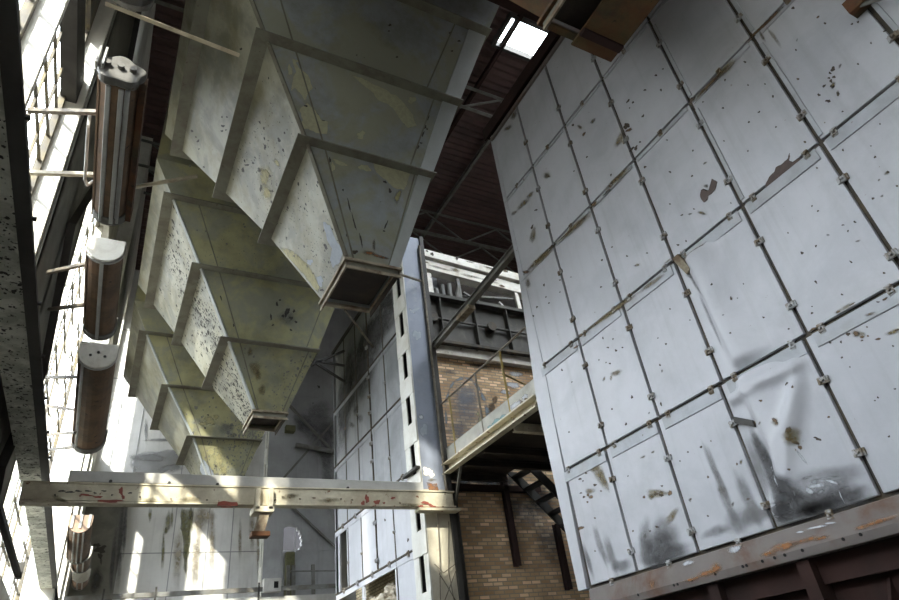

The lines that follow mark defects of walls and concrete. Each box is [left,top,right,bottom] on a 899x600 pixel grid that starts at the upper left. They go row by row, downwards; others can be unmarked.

peeling [329,157,410,201]
peeling [699,179,717,214]
peeling [765,153,800,186]
peeling [277,169,363,291]
leakage [161,510,214,575]